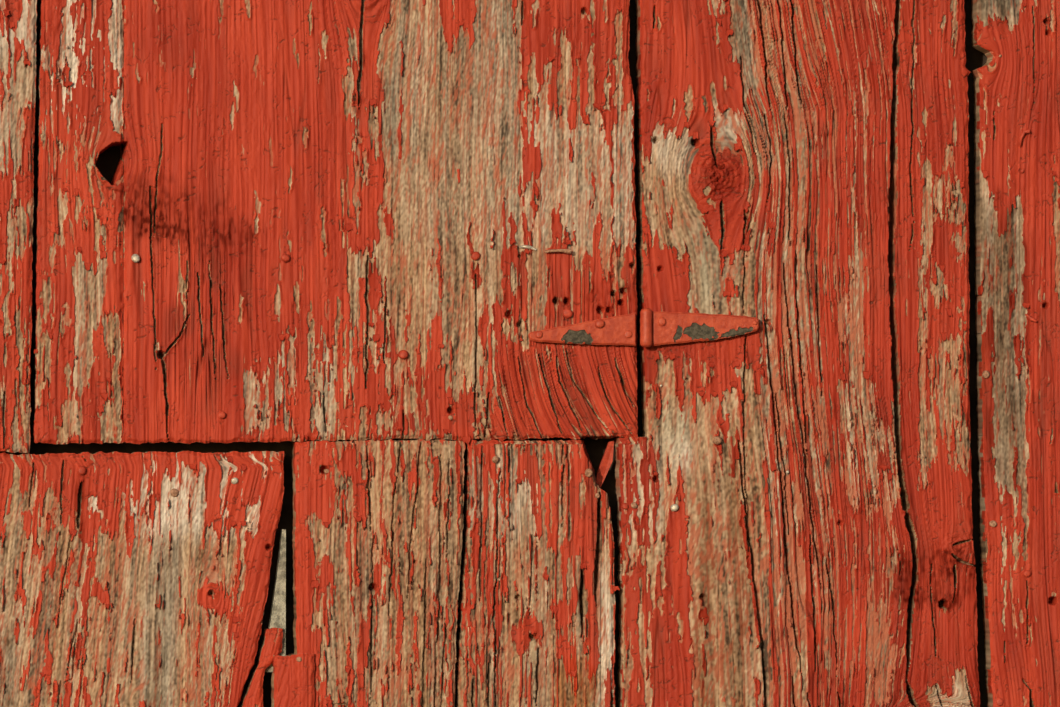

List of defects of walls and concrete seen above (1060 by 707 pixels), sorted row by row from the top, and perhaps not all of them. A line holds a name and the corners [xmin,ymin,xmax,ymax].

peeling [0,0,96,264]
peeling [0,184,123,449]
peeling [104,0,126,134]
crack [149,123,229,440]
peeling [241,0,972,707]
crack [887,0,973,707]
peeling [976,0,1027,31]
peeling [979,165,1030,564]
crack [1029,7,1037,93]
peeling [1050,171,1060,306]
peeling [0,451,261,707]
crack [1004,579,1034,707]